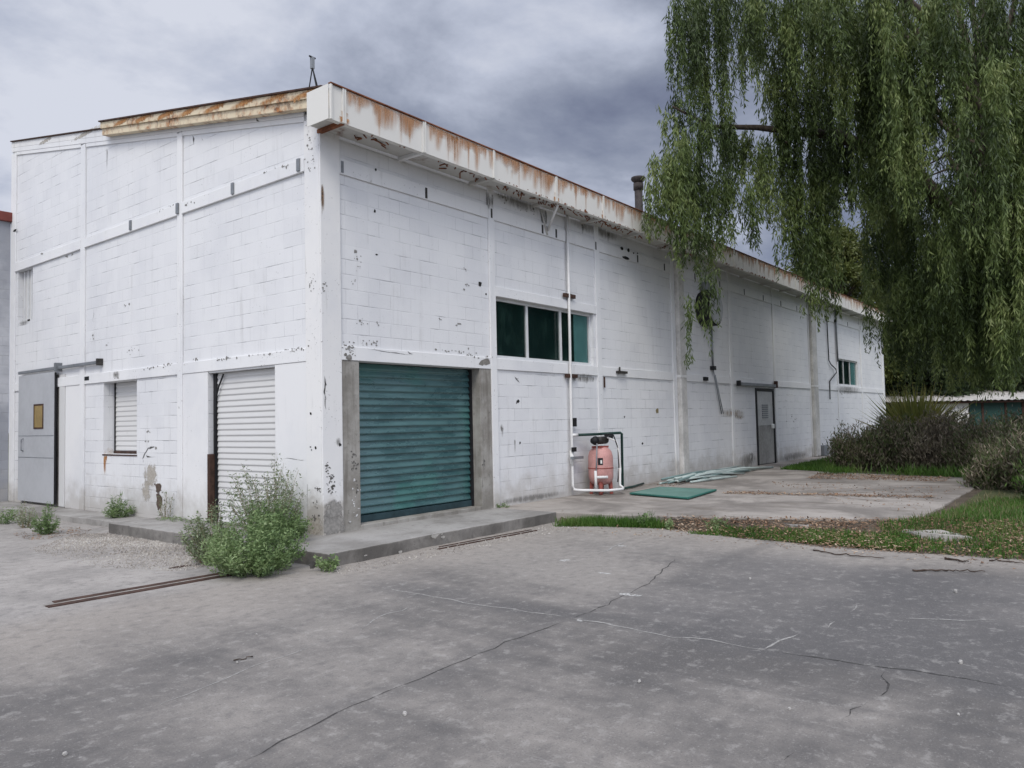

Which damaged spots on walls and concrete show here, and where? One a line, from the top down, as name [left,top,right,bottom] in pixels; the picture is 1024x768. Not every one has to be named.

corrosion [114,89,314,126]
corrosion [340,92,670,230]
peeling [143,481,165,504]
peeling [307,440,361,535]
crack [251,565,998,758]